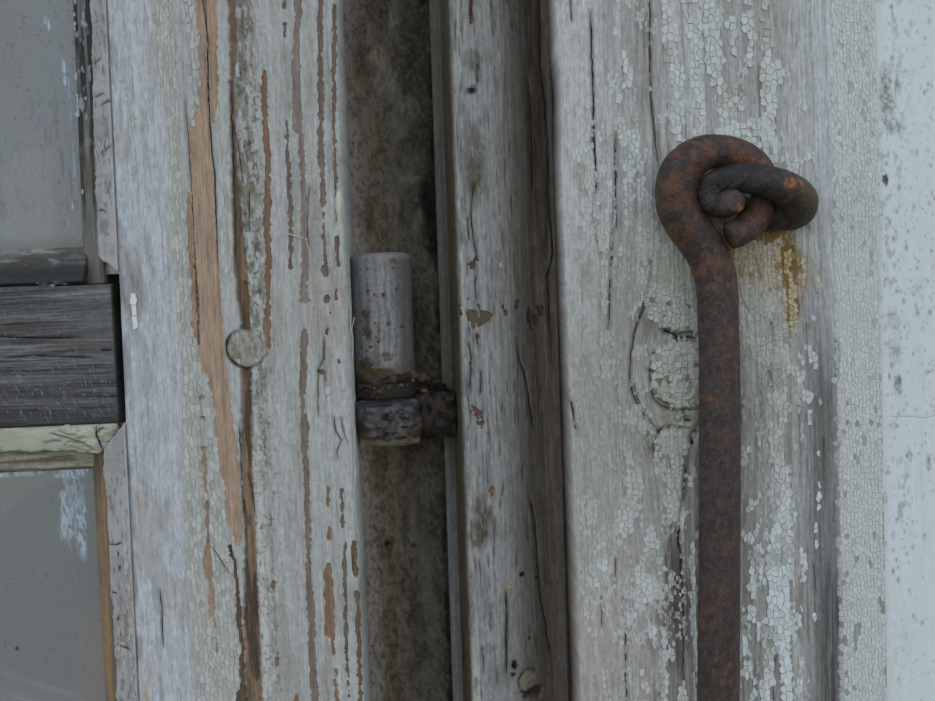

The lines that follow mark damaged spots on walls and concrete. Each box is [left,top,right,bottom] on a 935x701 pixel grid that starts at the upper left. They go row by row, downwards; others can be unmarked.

crack [43,427,103,449]
peeling [152,0,248,701]
peeling [260,70,273,349]
peeling [282,0,311,303]
peeling [316,0,341,277]
peeling [299,328,363,701]
corrosion [360,310,403,377]
peeling [572,27,699,587]
peeling [640,531,699,701]
peeling [661,0,817,174]
corrosion [747,230,799,317]
peeling [730,238,824,701]